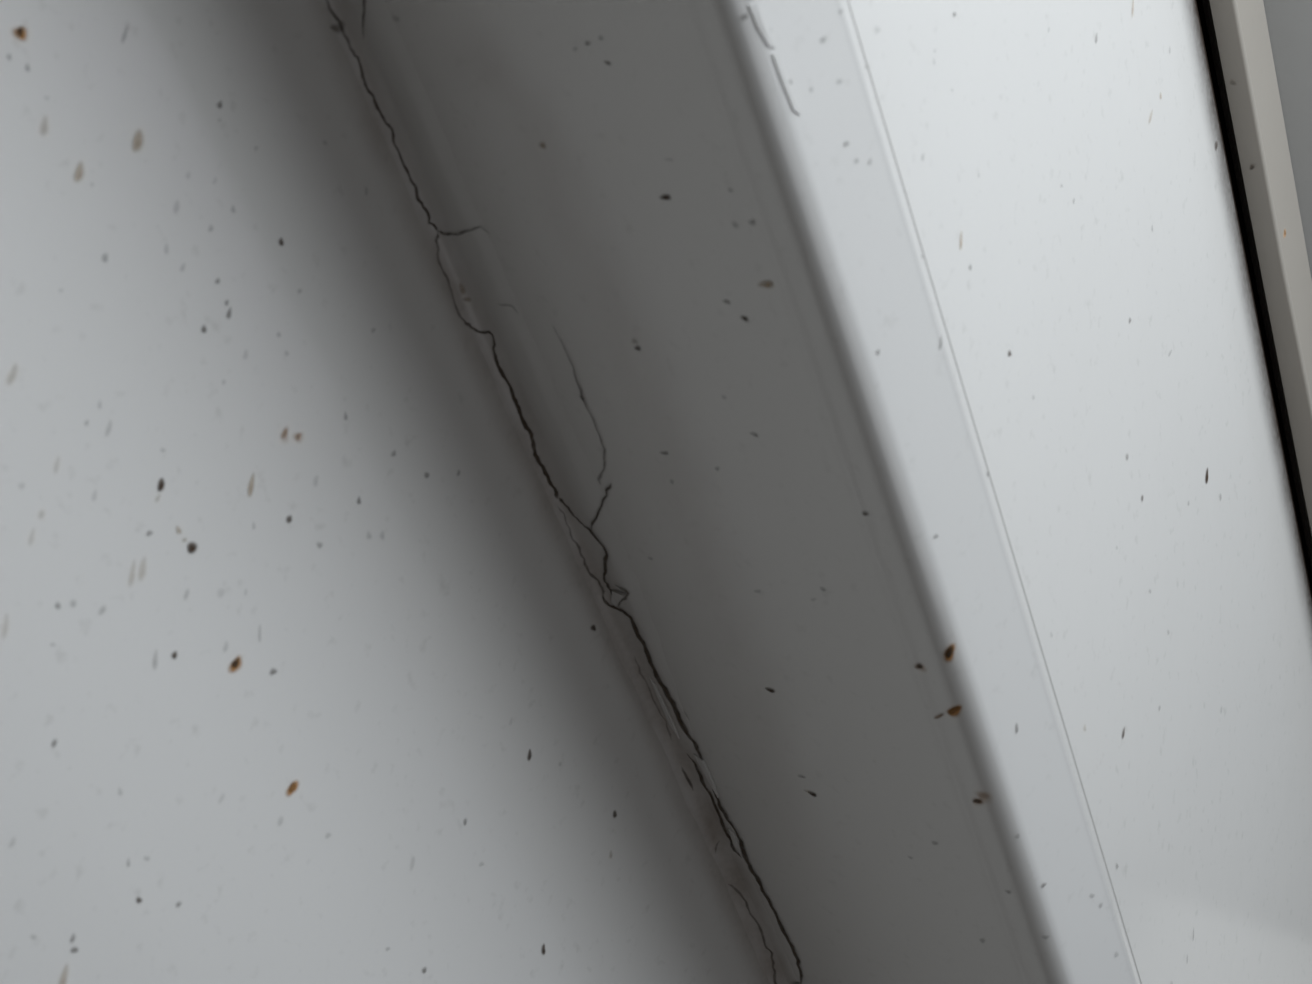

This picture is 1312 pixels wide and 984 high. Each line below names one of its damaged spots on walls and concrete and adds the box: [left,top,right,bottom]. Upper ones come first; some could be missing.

crack [328,0,476,243]
crack [465,322,803,984]